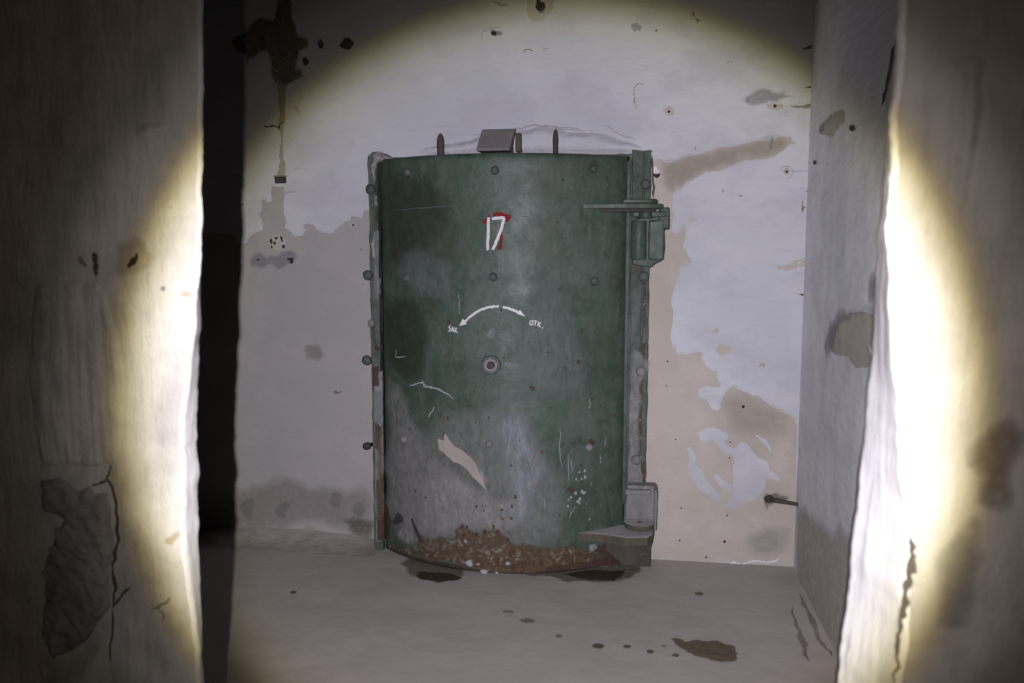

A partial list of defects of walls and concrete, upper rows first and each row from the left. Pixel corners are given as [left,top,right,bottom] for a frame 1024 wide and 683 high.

peeling [809,109,845,137]
peeling [197,0,374,539]
peeling [646,134,797,566]
peeling [825,312,873,368]
spalling [29,281,125,658]
crack [91,465,130,664]
crack [791,594,852,680]